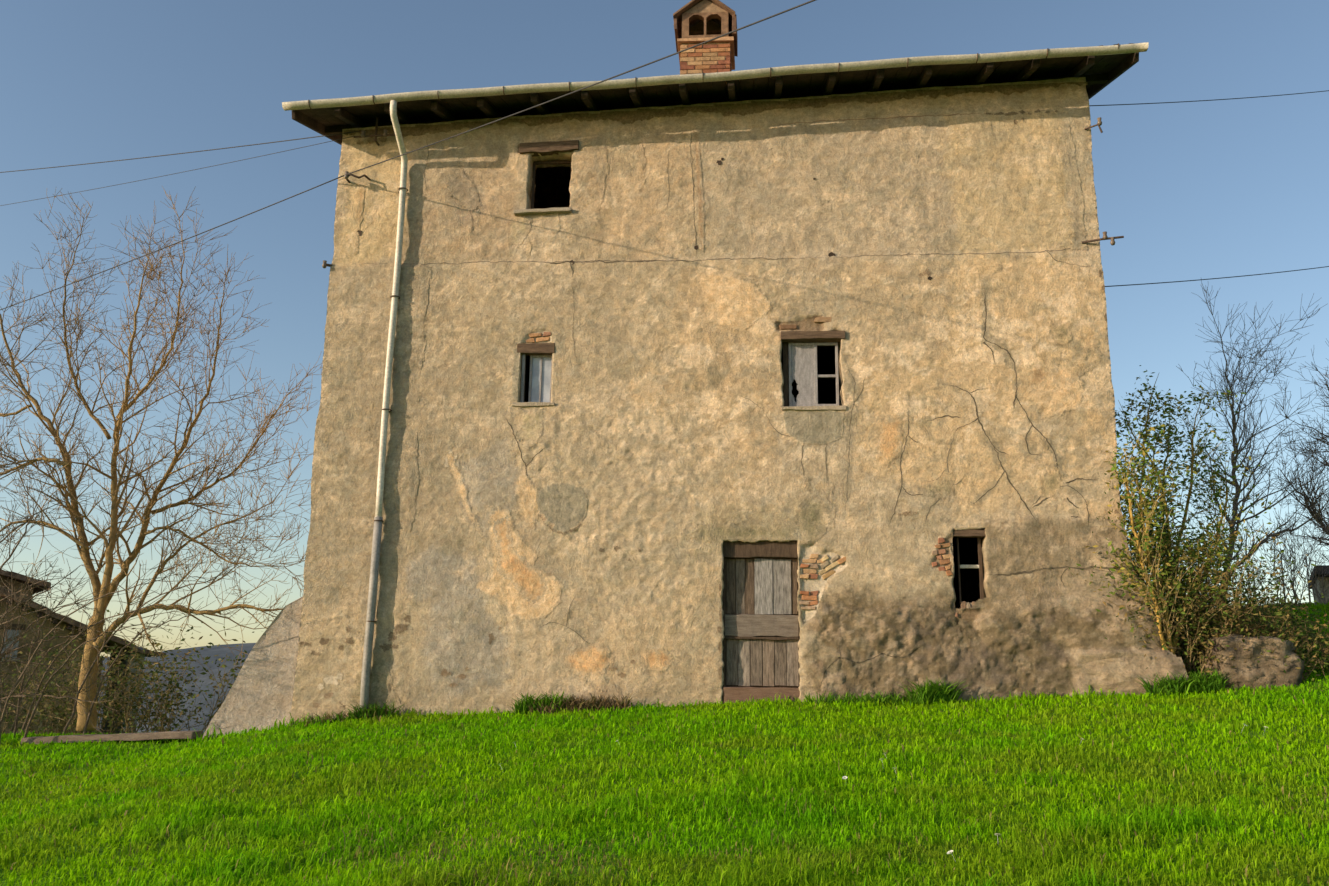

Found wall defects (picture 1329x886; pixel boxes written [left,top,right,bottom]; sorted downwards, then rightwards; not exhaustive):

crack [351,130,1135,585]
peeling [444,451,564,645]
spalling [799,540,849,622]
spalling [932,533,954,576]